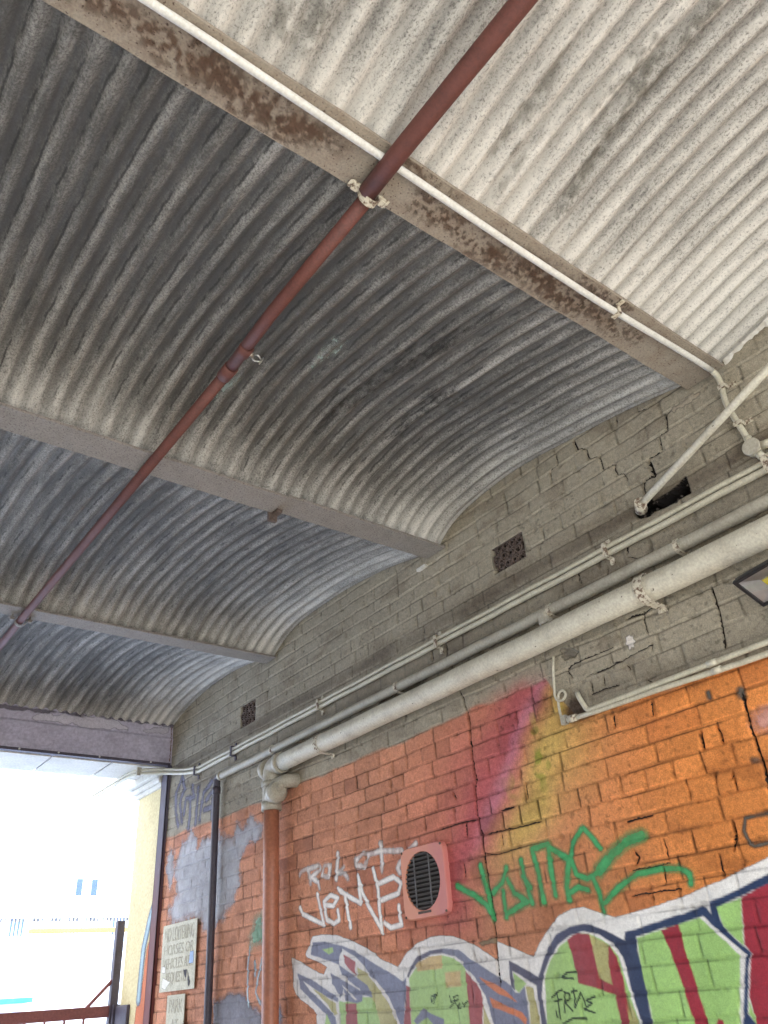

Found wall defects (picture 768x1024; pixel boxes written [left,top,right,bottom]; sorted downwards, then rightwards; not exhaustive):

corrosion [86,0,334,144]
corrosion [413,191,641,340]
crack [551,409,669,559]
spalling [638,477,691,519]
crack [568,607,654,716]
crack [712,590,726,649]
crack [742,694,768,789]
crack [443,693,542,983]